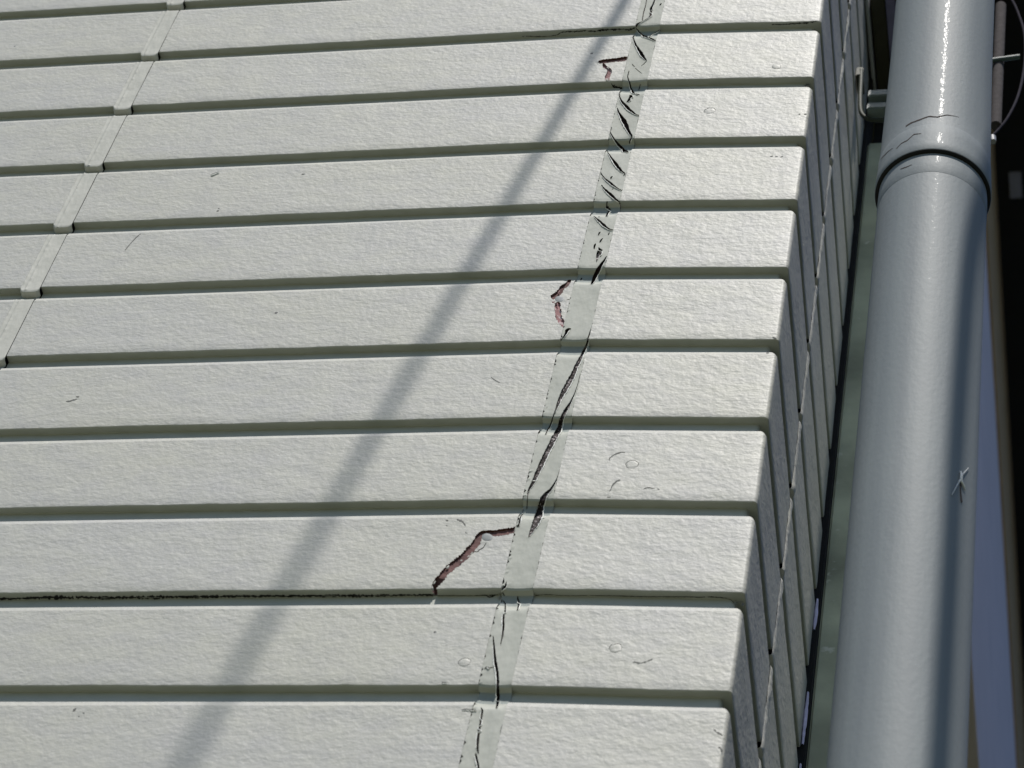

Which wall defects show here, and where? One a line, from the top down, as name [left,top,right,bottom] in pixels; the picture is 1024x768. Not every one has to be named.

crack [431,0,662,595]
crack [474,581,521,768]